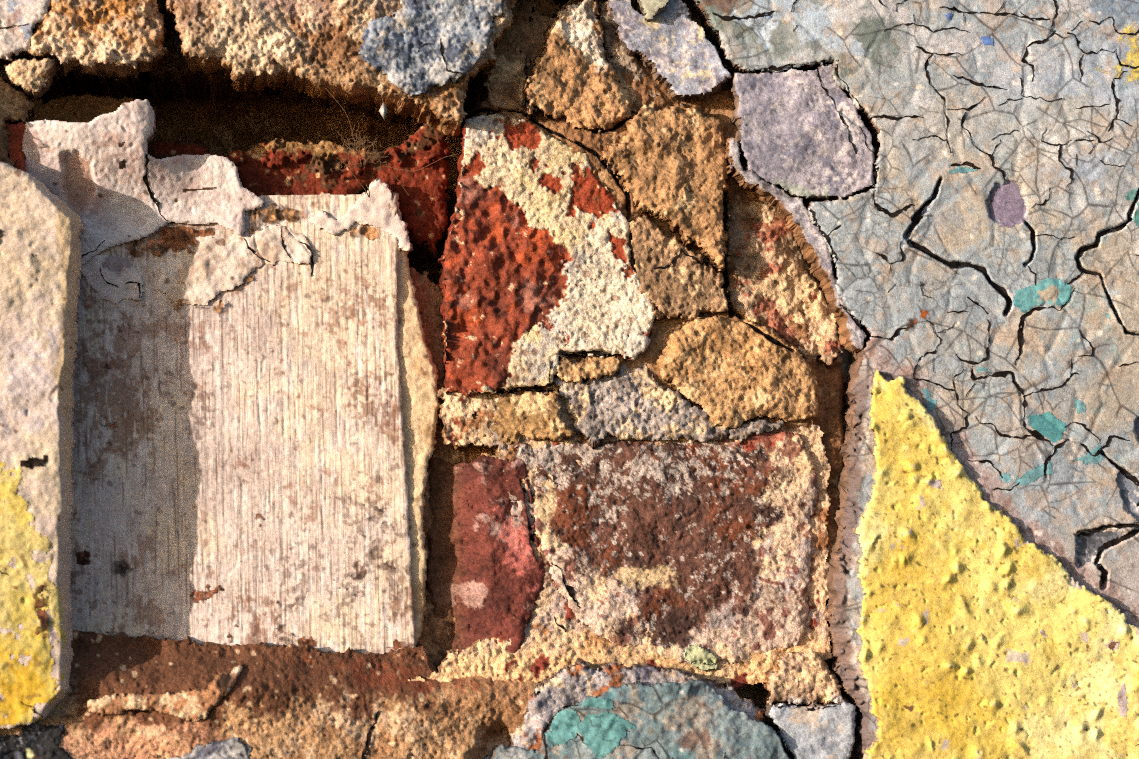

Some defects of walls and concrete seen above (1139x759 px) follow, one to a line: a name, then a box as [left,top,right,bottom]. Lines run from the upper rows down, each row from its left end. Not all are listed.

peeling [81,225,313,305]
crack [654,192,792,352]
crack [691,0,1139,586]
spalling [425,454,545,672]
spalling [684,643,718,672]
crack [361,710,381,759]
crack [542,704,585,759]
crack [619,724,673,759]
crack [764,704,835,759]